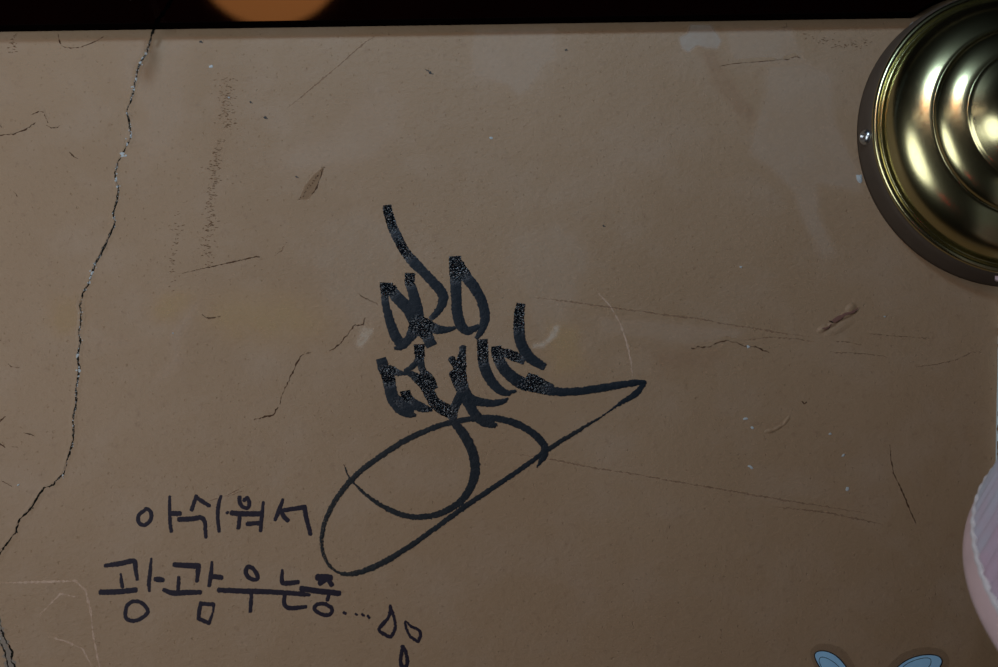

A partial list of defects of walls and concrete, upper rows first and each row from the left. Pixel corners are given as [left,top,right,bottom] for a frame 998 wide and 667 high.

crack [0,0,173,566]
crack [254,293,377,420]
crack [0,616,16,667]